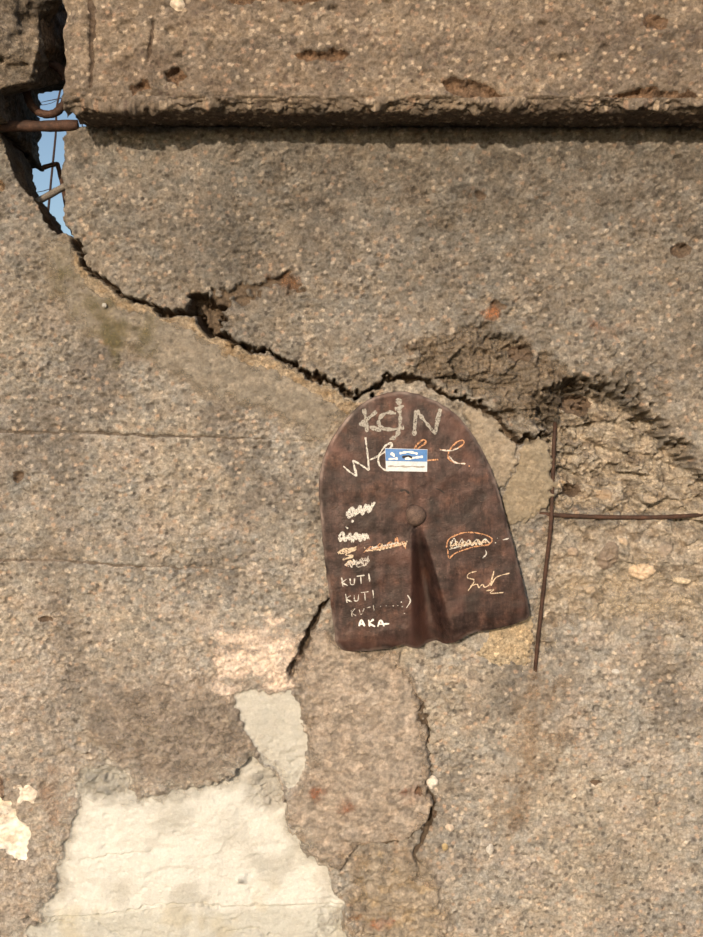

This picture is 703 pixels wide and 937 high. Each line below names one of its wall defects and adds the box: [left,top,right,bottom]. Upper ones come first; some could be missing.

crack [71,238,550,445]
spalling [457,381,703,669]
crack [287,598,330,676]
spalling [0,776,37,861]
crack [382,664,436,878]